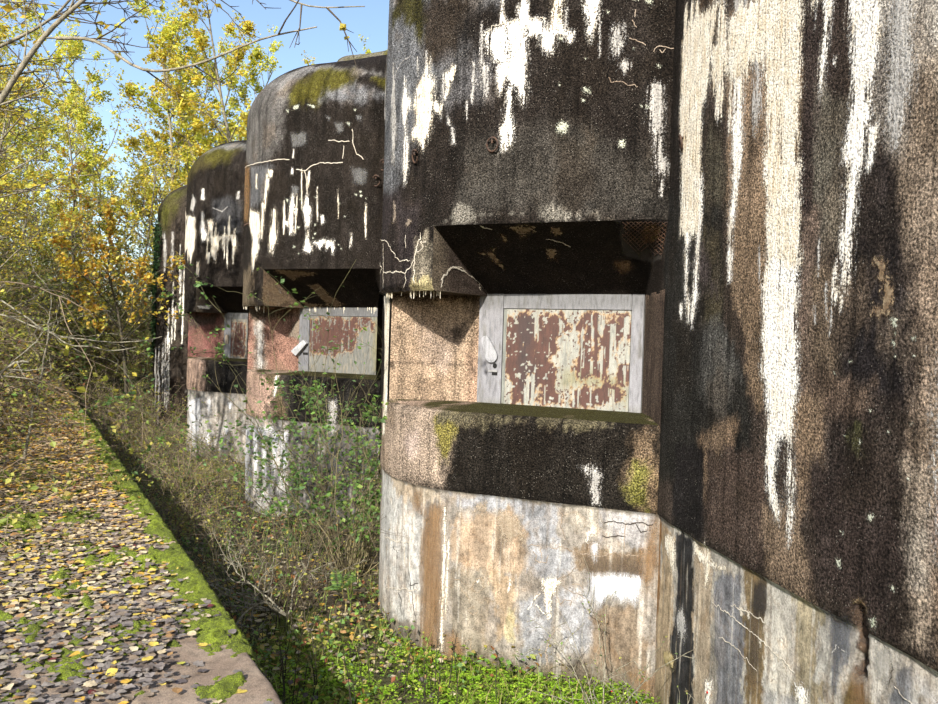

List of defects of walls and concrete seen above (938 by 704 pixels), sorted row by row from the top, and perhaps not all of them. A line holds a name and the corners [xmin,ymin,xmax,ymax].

crack [246,130,363,193]
efflorescence [384,52,456,181]
efflorescence [466,0,575,151]
leakage [647,82,670,197]
leakage [813,0,918,335]
efflorescence [154,189,237,412]
crack [380,233,426,288]
crack [441,266,485,290]
leakage [679,0,836,548]
corrosion [416,498,441,651]
crack [531,512,653,606]
crack [867,601,912,704]